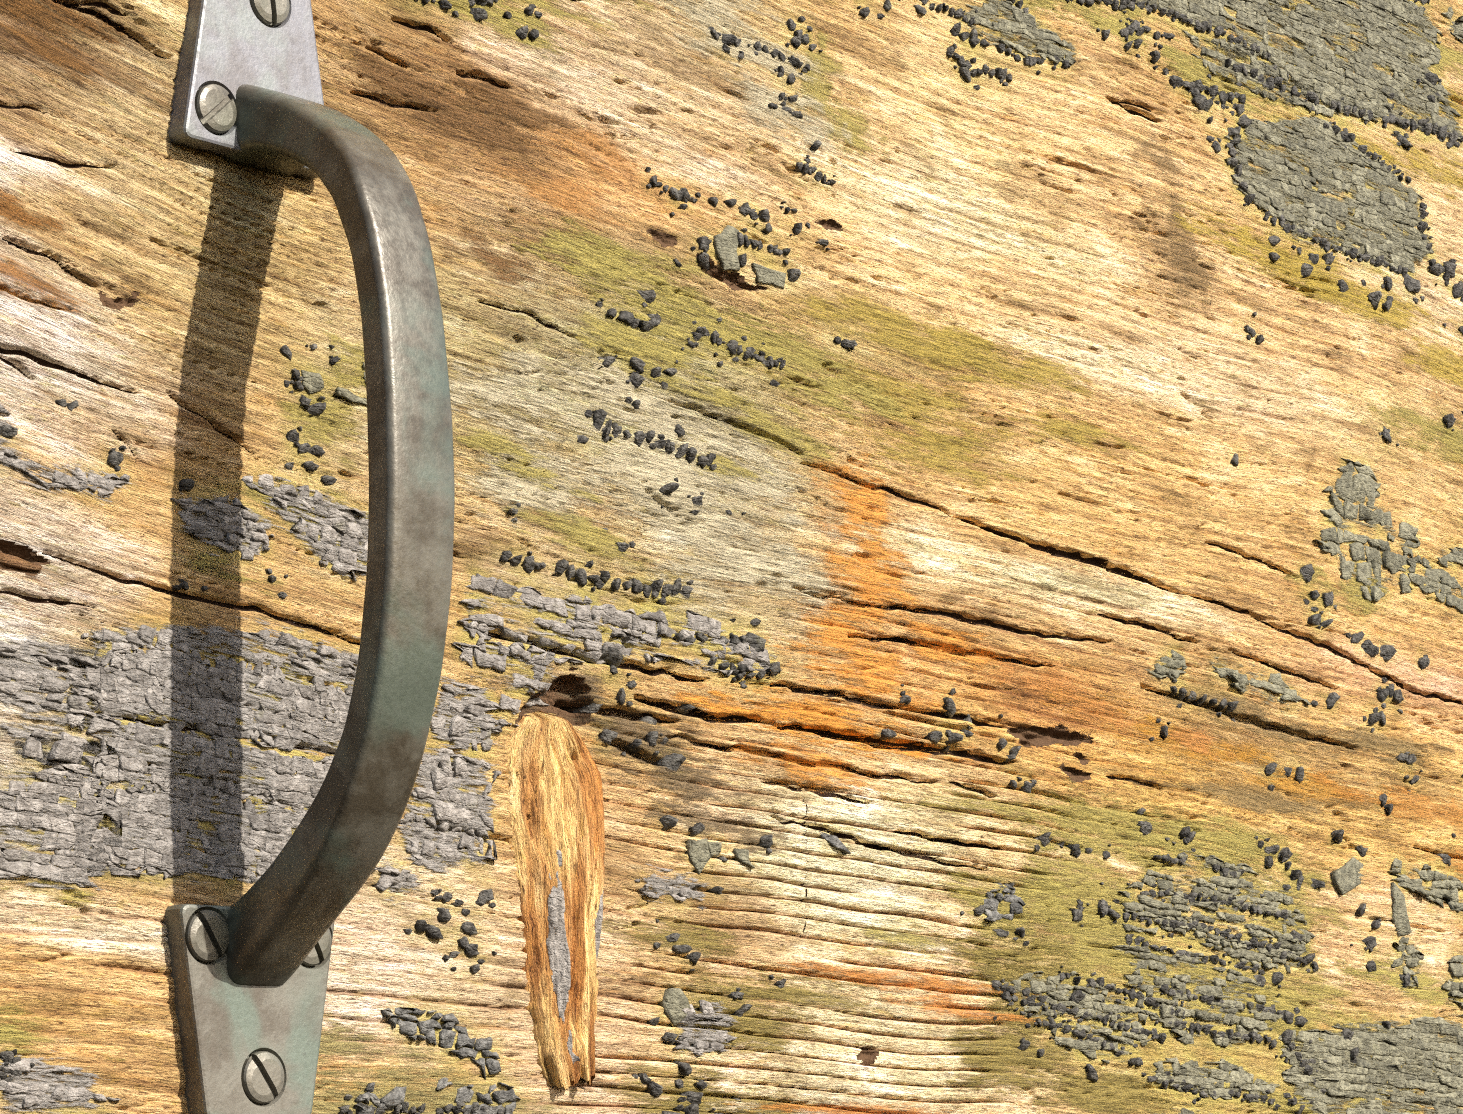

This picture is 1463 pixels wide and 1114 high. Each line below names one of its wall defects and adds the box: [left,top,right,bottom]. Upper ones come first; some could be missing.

crack [0,239,93,309]
peeling [645,167,830,289]
peeling [708,16,823,119]
peeling [857,0,1082,91]
peeling [1065,0,1463,311]
peeling [170,344,368,599]
peeling [577,409,717,471]
peeling [1300,457,1463,733]
peeling [0,616,361,893]
peeling [372,550,782,974]
peeling [338,1007,521,1114]
peeling [990,808,1463,1114]